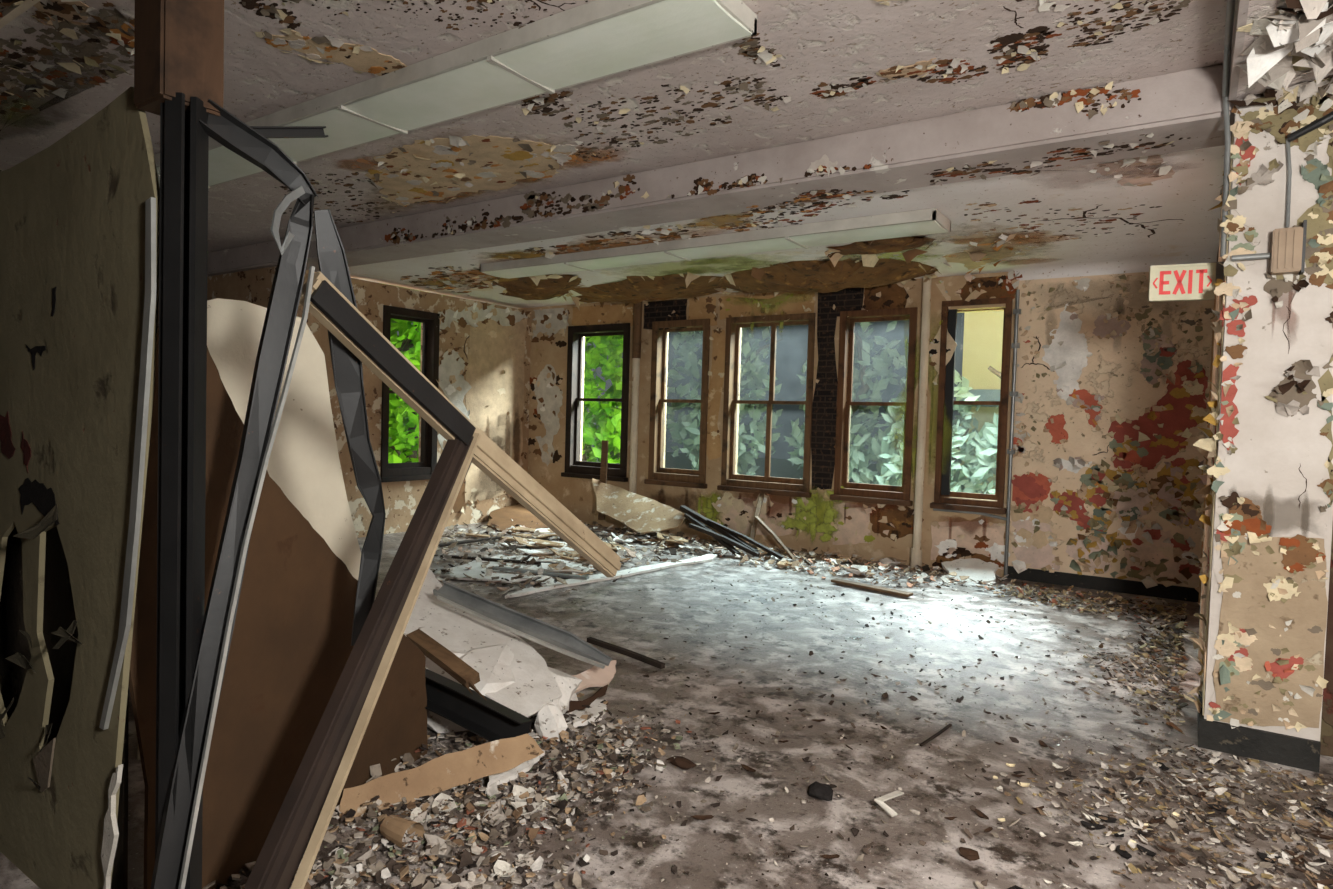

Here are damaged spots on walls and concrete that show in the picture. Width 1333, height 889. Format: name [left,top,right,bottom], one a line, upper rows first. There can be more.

peeling [0,0,135,115]
peeling [239,0,553,77]
peeling [290,0,1333,889]
peeling [202,861,256,889]